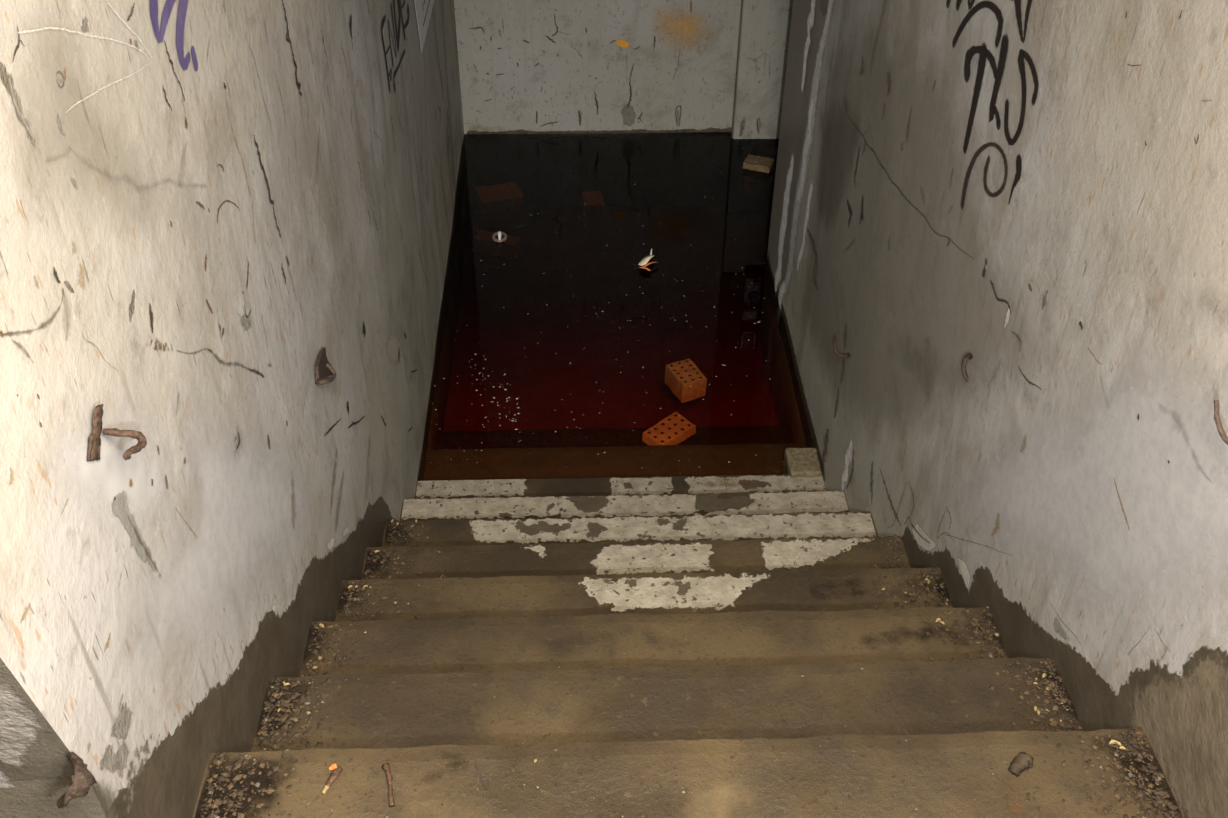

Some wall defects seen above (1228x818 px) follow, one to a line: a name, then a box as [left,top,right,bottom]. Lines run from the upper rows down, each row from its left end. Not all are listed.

crack [179,349,271,377]
water stain [765,251,829,481]
water stain [841,440,854,491]
crack [849,118,1042,390]
water stain [92,497,397,818]
water stain [871,463,1228,818]